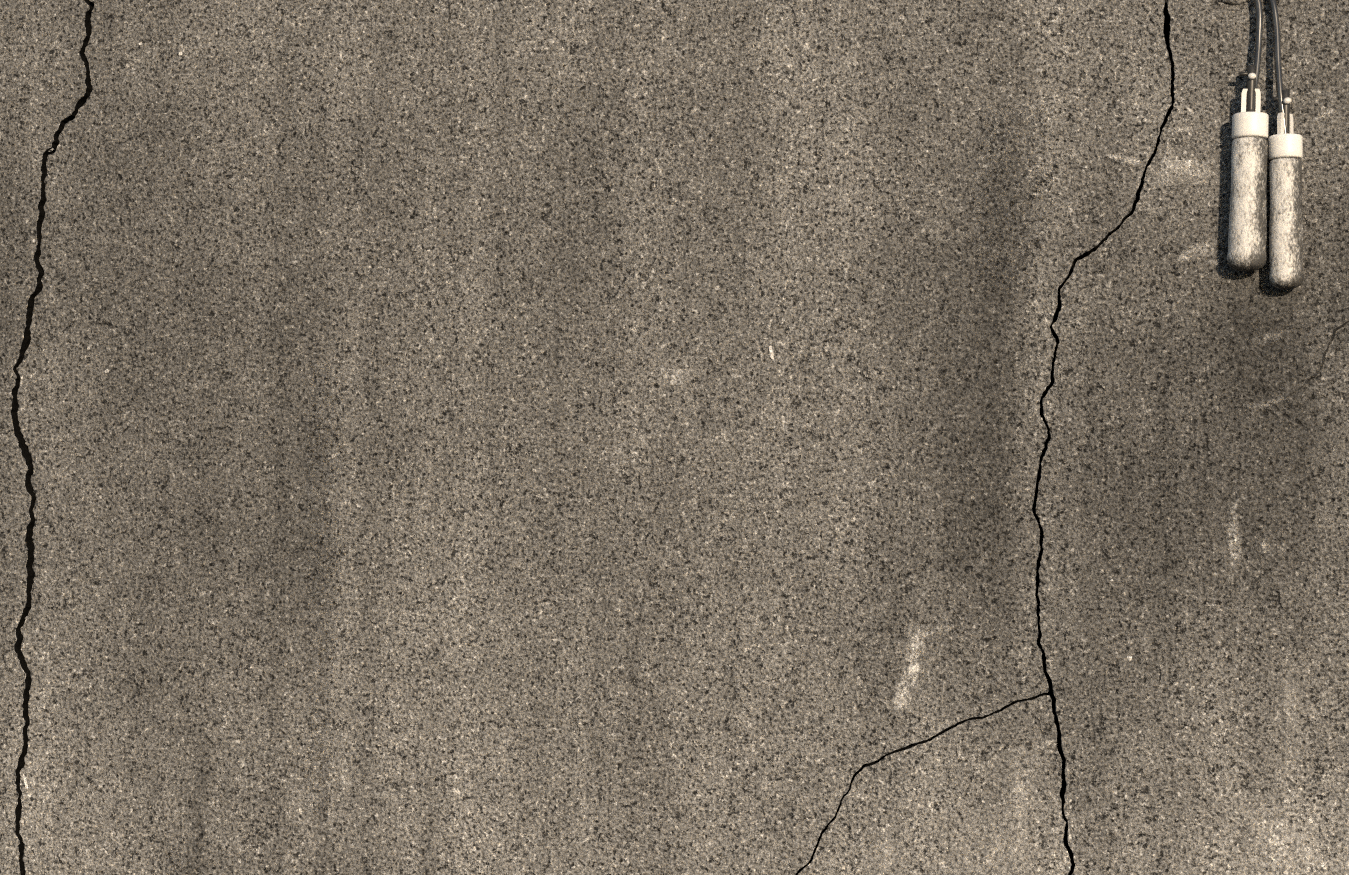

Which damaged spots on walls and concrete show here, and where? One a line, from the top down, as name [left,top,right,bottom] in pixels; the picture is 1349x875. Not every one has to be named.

crack [10,0,95,875]
crack [795,0,1175,875]